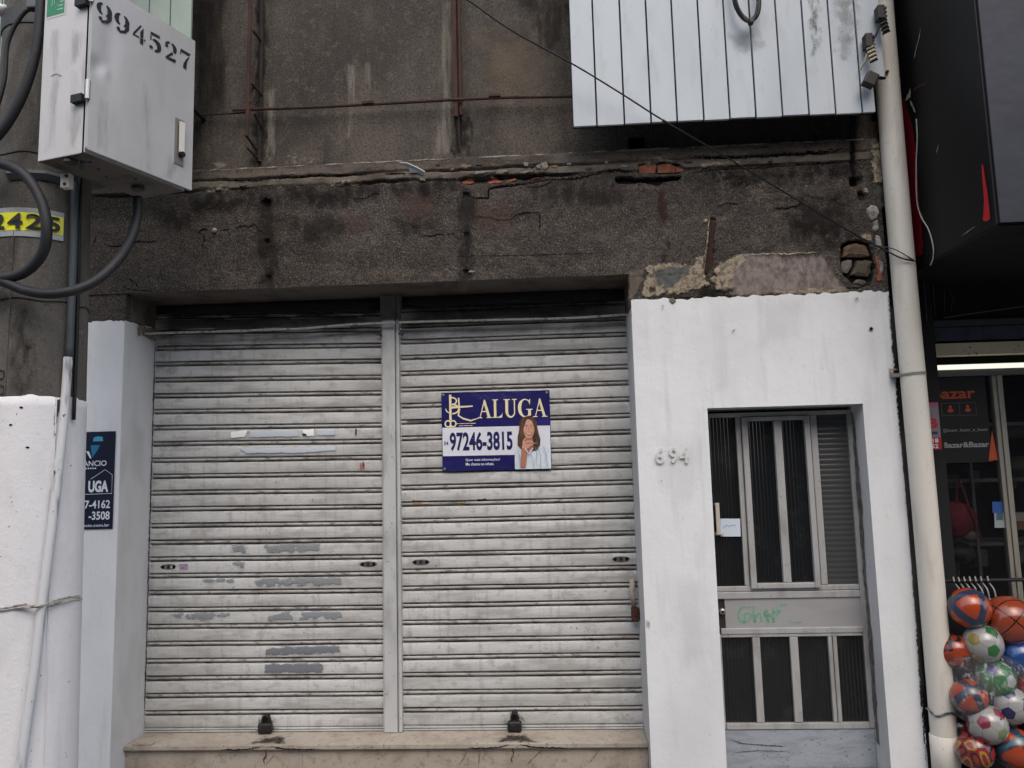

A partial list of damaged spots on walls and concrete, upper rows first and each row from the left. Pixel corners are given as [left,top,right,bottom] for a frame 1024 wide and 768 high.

crack [424,168,631,257]
flaking render [437,155,742,213]
peeling [629,115,885,304]